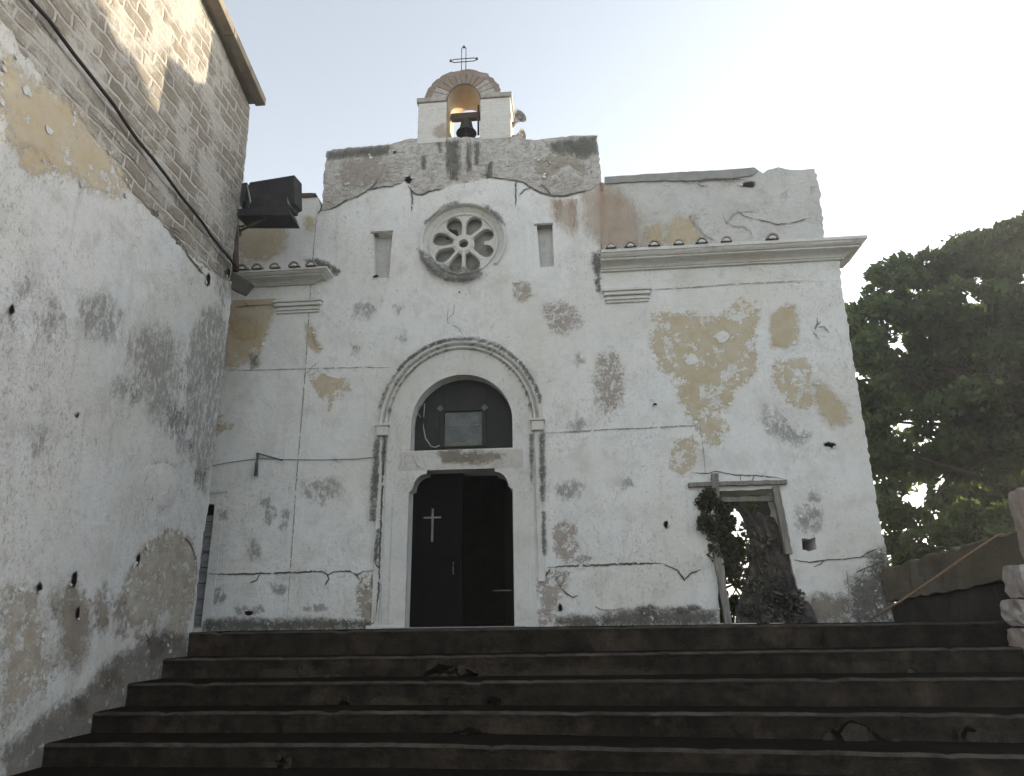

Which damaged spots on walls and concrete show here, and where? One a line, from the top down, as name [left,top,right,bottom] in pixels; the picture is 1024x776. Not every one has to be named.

flaking render [0,55,132,198]
crack [482,174,596,205]
crack [689,211,807,240]
flaking render [225,298,275,369]
flaking render [309,370,351,411]
flaking render [651,298,852,475]
crack [185,285,388,625]
crack [545,562,702,615]
crack [797,549,883,608]
leakage [51,583,126,670]
leakage [1,634,188,776]